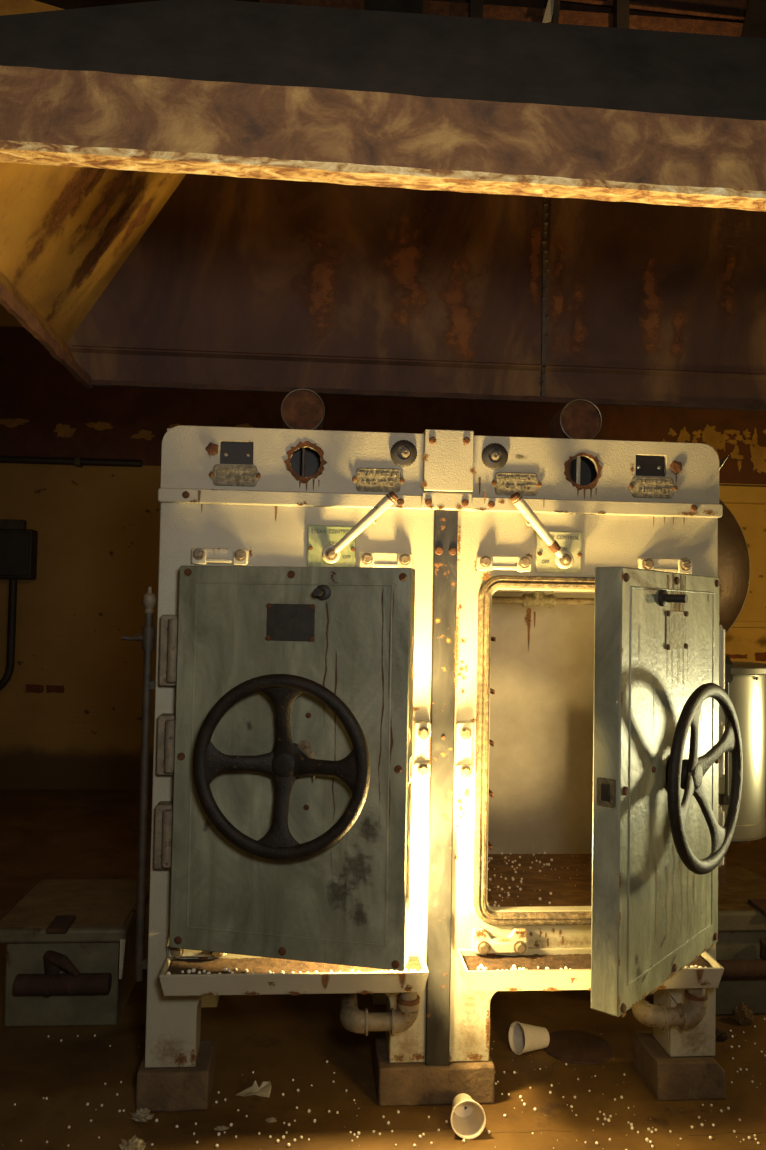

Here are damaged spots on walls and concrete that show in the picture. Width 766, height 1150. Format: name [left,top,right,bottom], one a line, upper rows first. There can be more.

peeling [662,424,766,473]